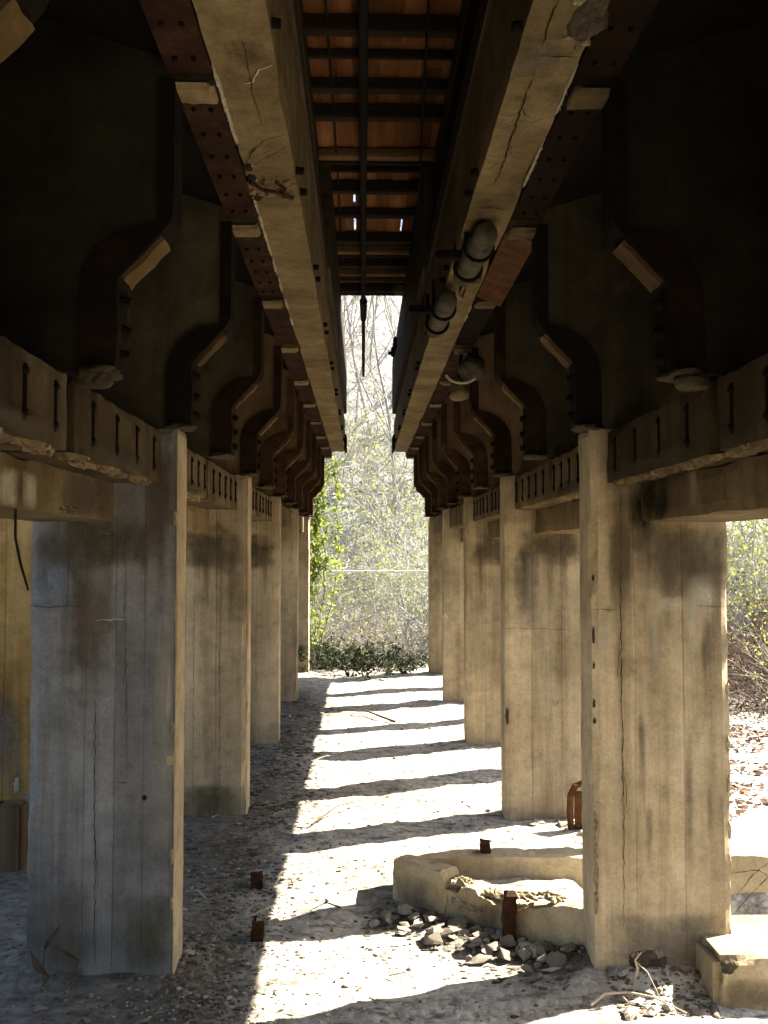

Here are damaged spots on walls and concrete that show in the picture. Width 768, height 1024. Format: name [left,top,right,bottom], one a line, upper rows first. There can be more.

crack [242,42,287,167]
crack [470,1,572,211]
spalling [554,0,611,117]
spalling [0,427,152,487]
leakage [517,534,578,609]
leakage [632,482,723,604]
crack [604,498,627,926]
crack [91,700,99,941]
spalling [447,874,569,915]